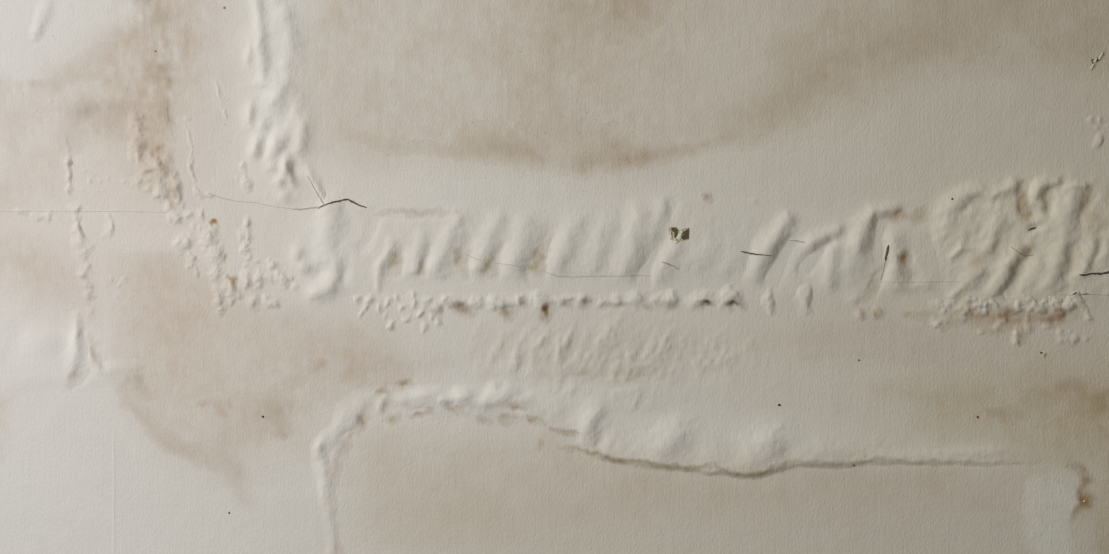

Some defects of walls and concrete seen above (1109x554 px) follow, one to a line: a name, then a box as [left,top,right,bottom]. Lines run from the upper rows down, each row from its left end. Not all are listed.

water stain [312,0,1109,195]
water stain [0,0,465,512]
crack [208,177,367,211]
water stain [446,242,500,282]
water stain [517,230,554,279]
peeling [668,227,690,244]
water stain [893,247,914,289]
water stain [879,203,932,227]
crack [1061,270,1109,296]
water stain [327,274,1109,554]